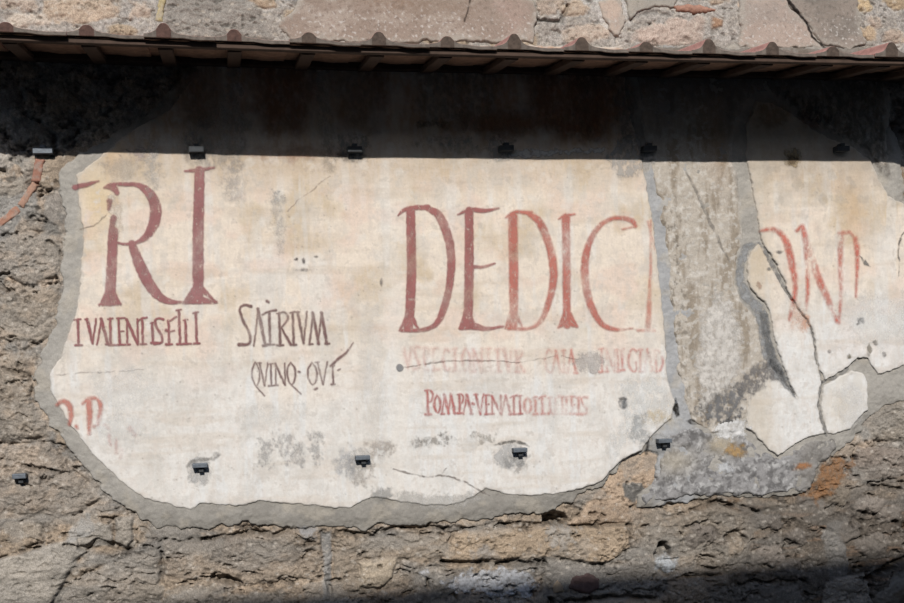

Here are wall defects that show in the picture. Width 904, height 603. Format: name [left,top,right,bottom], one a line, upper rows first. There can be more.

crack [787,0,824,47]
water stain [436,89,652,177]
spalling [784,148,801,168]
spalling [736,243,795,397]
crack [758,242,849,436]